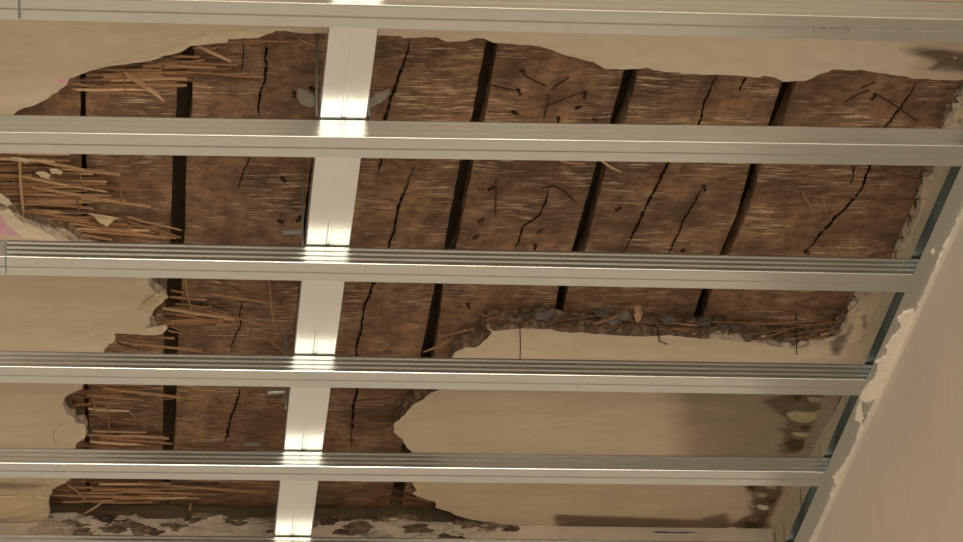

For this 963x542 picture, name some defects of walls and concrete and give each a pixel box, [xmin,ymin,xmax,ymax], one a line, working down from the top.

flaking render [12,27,327,114]
crack [240,43,268,116]
leakage [898,46,963,75]
flaking render [0,193,121,242]
crack [387,166,415,248]
crack [623,162,671,253]
crack [804,165,872,253]
flaking render [135,277,168,335]
crack [355,282,376,356]
flaking render [447,291,884,358]
flaking render [393,389,439,442]
leakage [652,393,846,457]